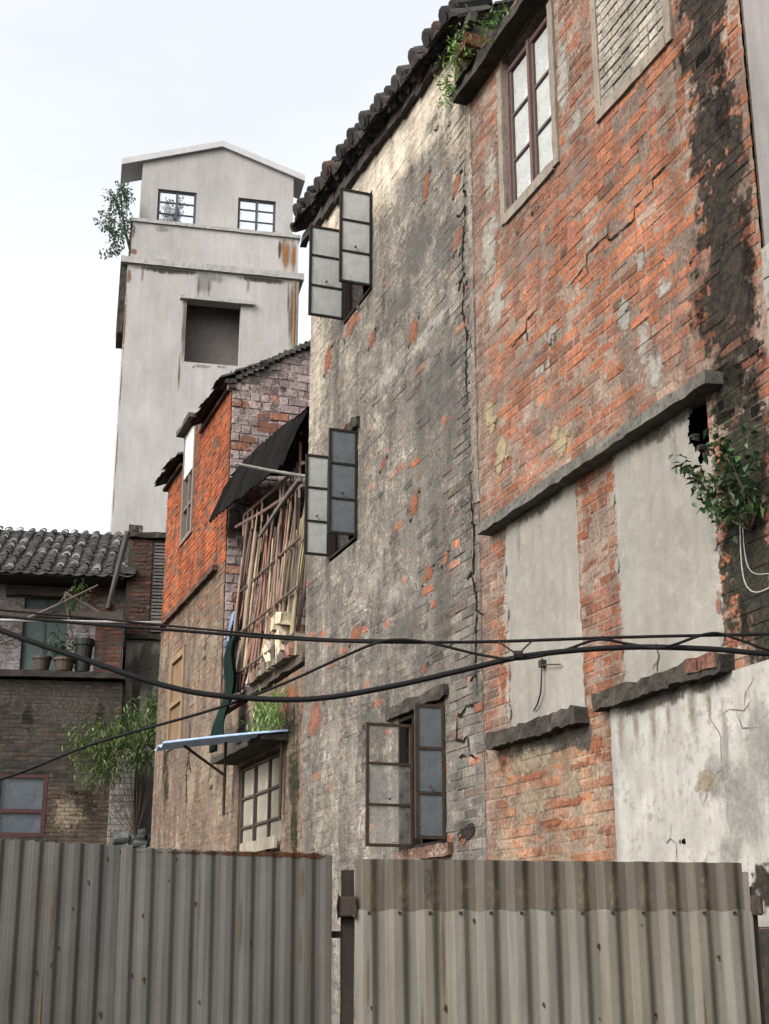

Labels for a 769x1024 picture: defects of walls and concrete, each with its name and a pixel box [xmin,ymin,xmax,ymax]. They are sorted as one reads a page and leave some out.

rust [278,239,296,268]
crack [456,163,472,416]
crack [566,167,664,288]
damp [671,0,766,420]
spalling [457,822,475,845]
damp [620,676,725,715]
crack [703,678,757,805]
damp [706,703,769,861]